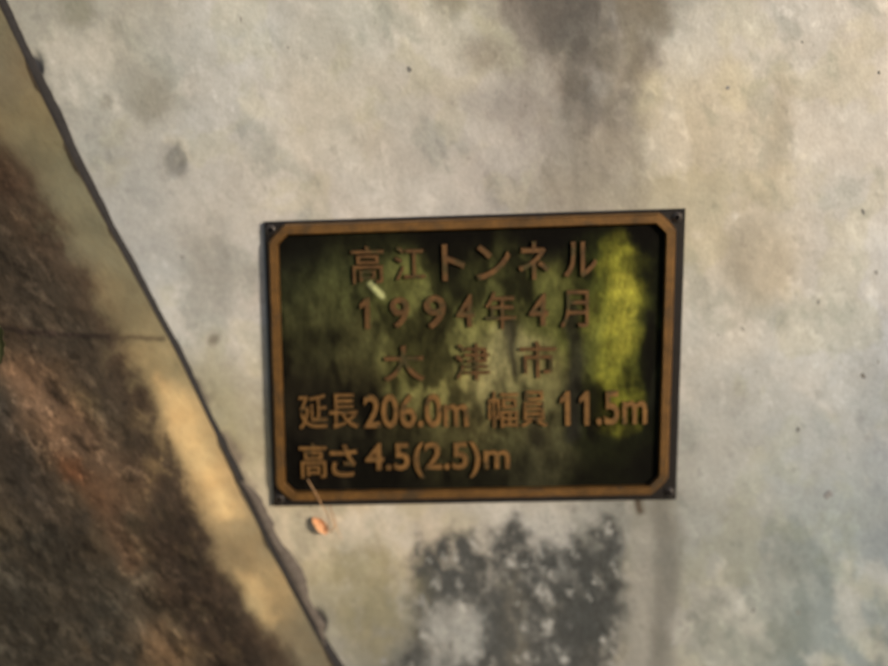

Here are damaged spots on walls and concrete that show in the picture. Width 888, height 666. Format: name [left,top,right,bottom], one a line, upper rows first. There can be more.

water stain [407,0,694,213]